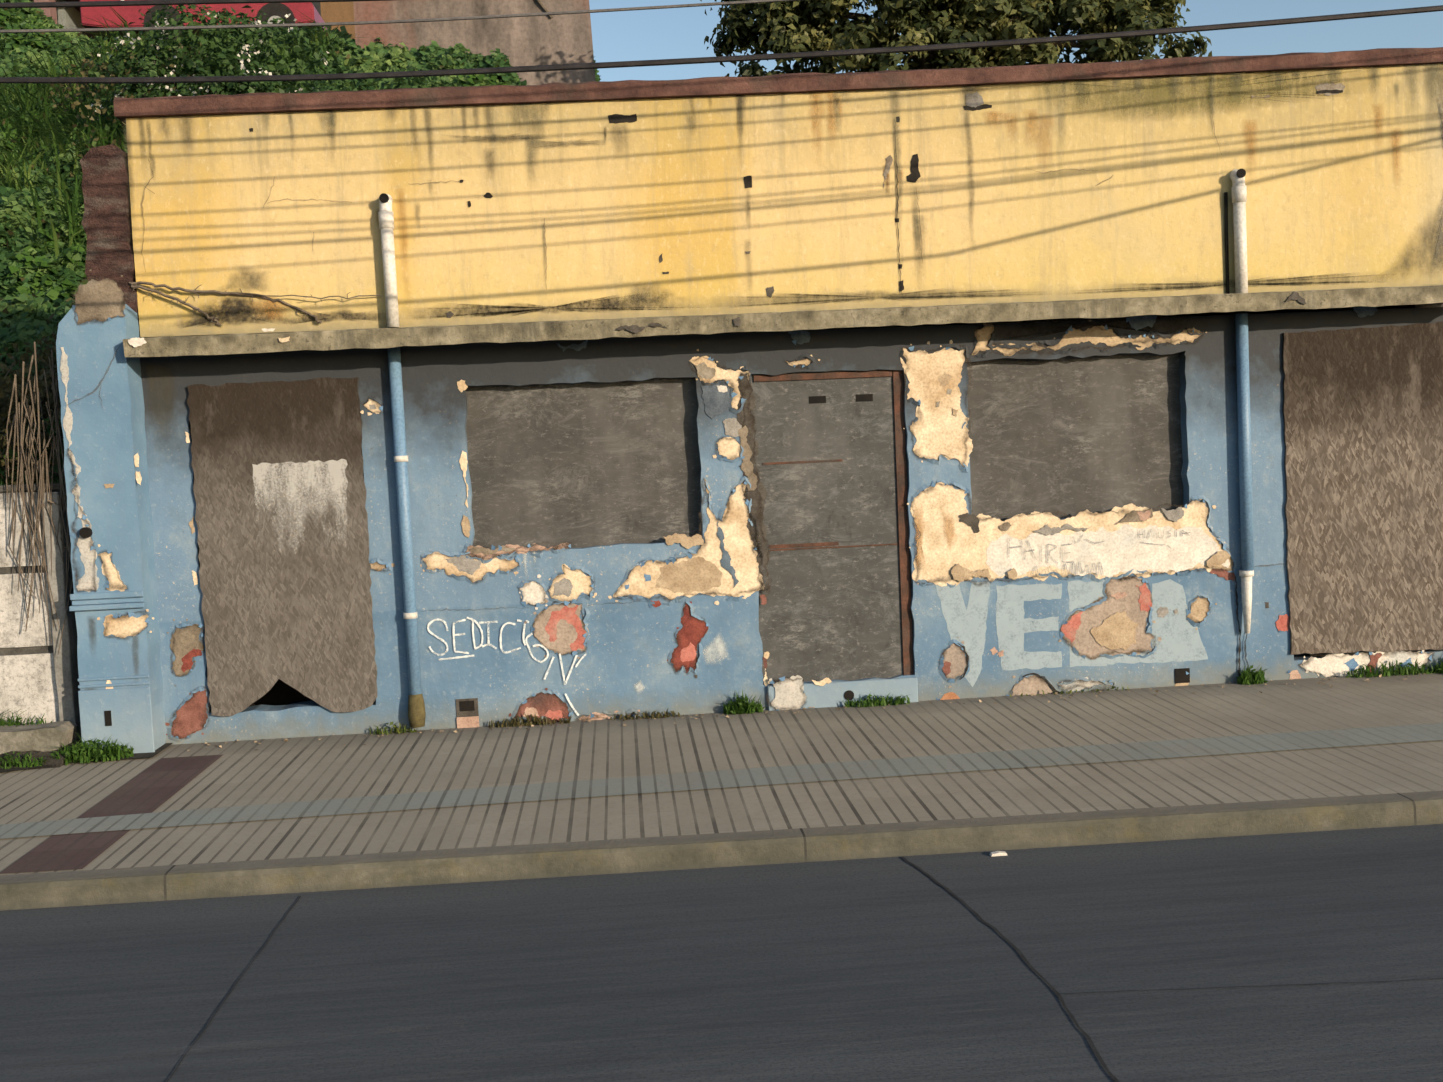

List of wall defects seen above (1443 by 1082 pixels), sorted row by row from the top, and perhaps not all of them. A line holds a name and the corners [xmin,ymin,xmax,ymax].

leakage [1074,75,1309,113]
leakage [193,275,281,324]
leakage [304,312,370,322]
leakage [438,294,653,316]
peeling [60,347,127,592]
peeling [899,315,1237,660]
peeling [420,349,770,678]
flaking render [97,609,210,742]
flaking render [509,688,640,724]
flaking render [936,637,970,700]
flaking render [1006,672,1116,696]
peeling [1287,650,1434,679]